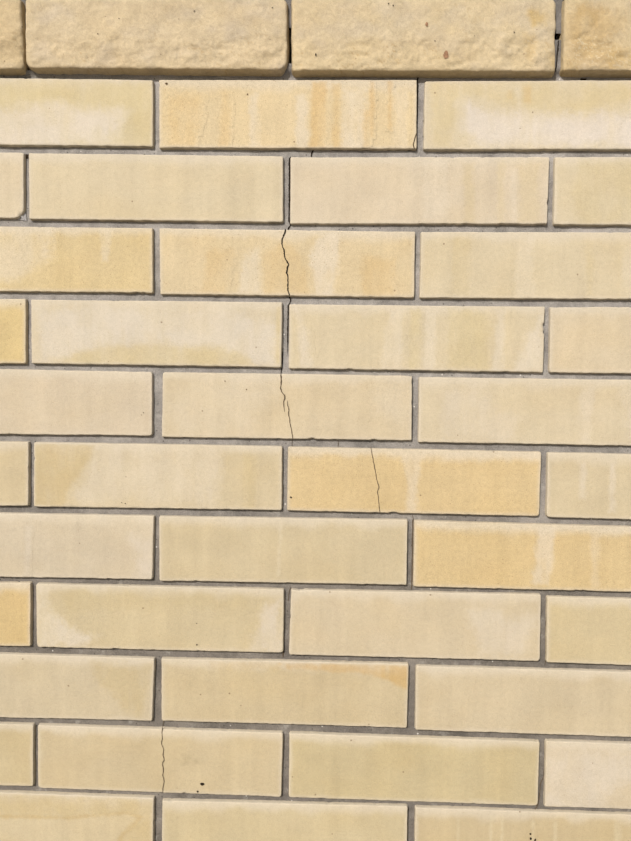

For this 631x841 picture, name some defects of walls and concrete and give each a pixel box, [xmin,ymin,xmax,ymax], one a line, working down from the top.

crack [280,157,293,439]